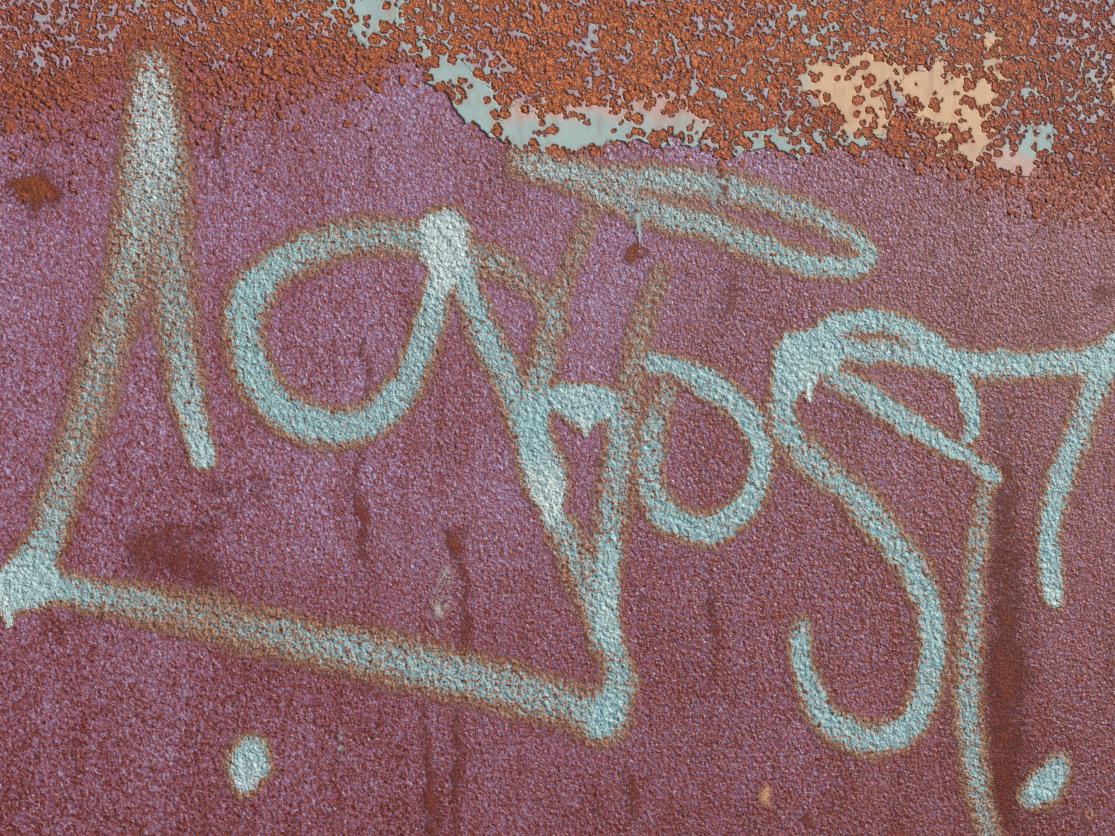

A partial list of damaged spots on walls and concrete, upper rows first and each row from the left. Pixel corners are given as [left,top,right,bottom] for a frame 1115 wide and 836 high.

rust [0,0,1115,239]
peeling [416,39,718,156]
peeling [728,50,1054,178]